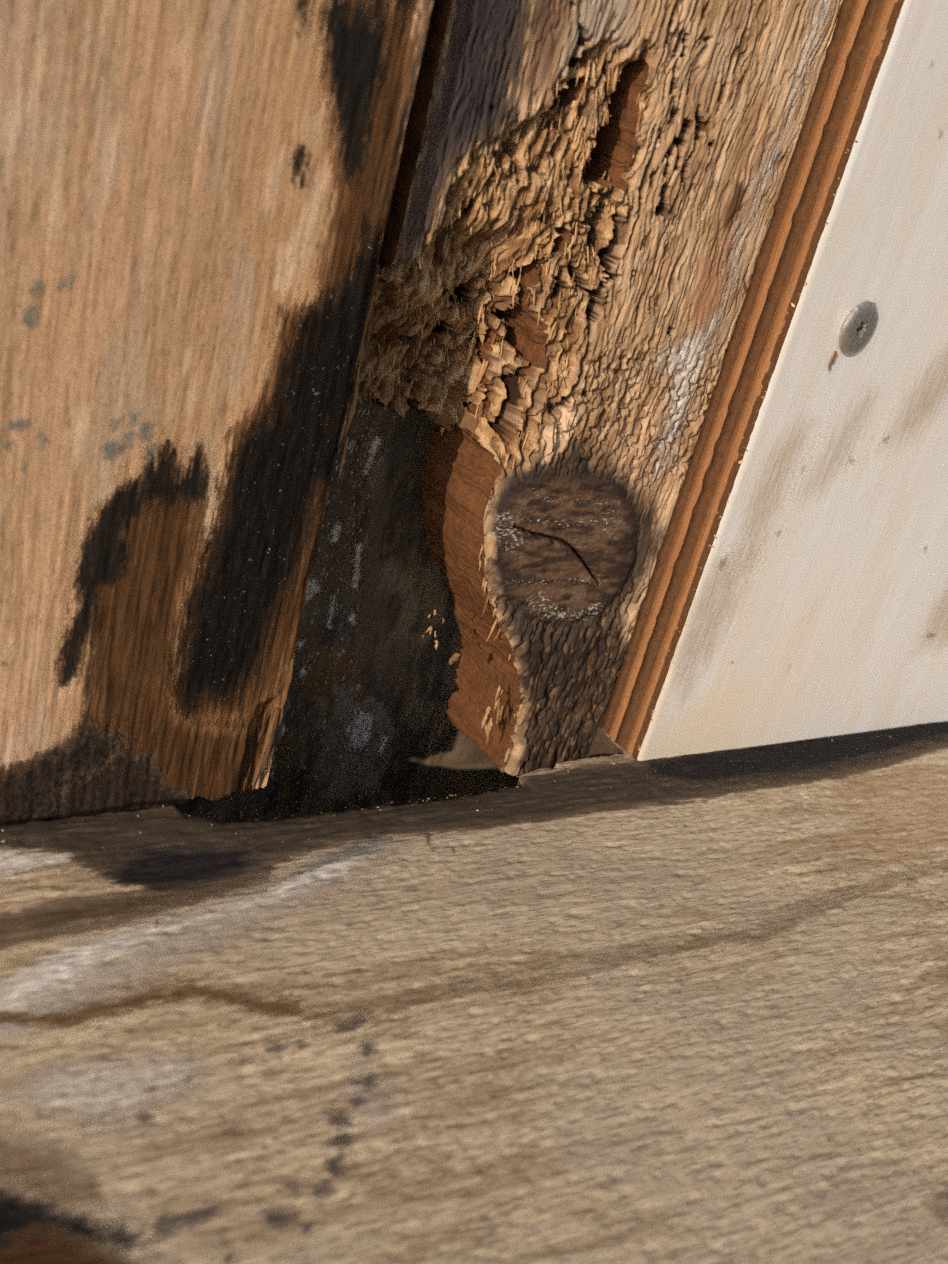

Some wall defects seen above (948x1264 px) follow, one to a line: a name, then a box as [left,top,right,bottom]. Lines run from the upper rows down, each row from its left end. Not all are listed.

water stain [0,0,425,821]
spalling [377,0,453,275]
water stain [381,0,537,273]
spalling [463,226,571,418]
spalling [550,76,587,110]
spalling [582,53,649,191]
water stain [649,0,836,479]
spalling [351,385,521,773]
crack [514,525,595,579]
water stain [0,721,948,1040]